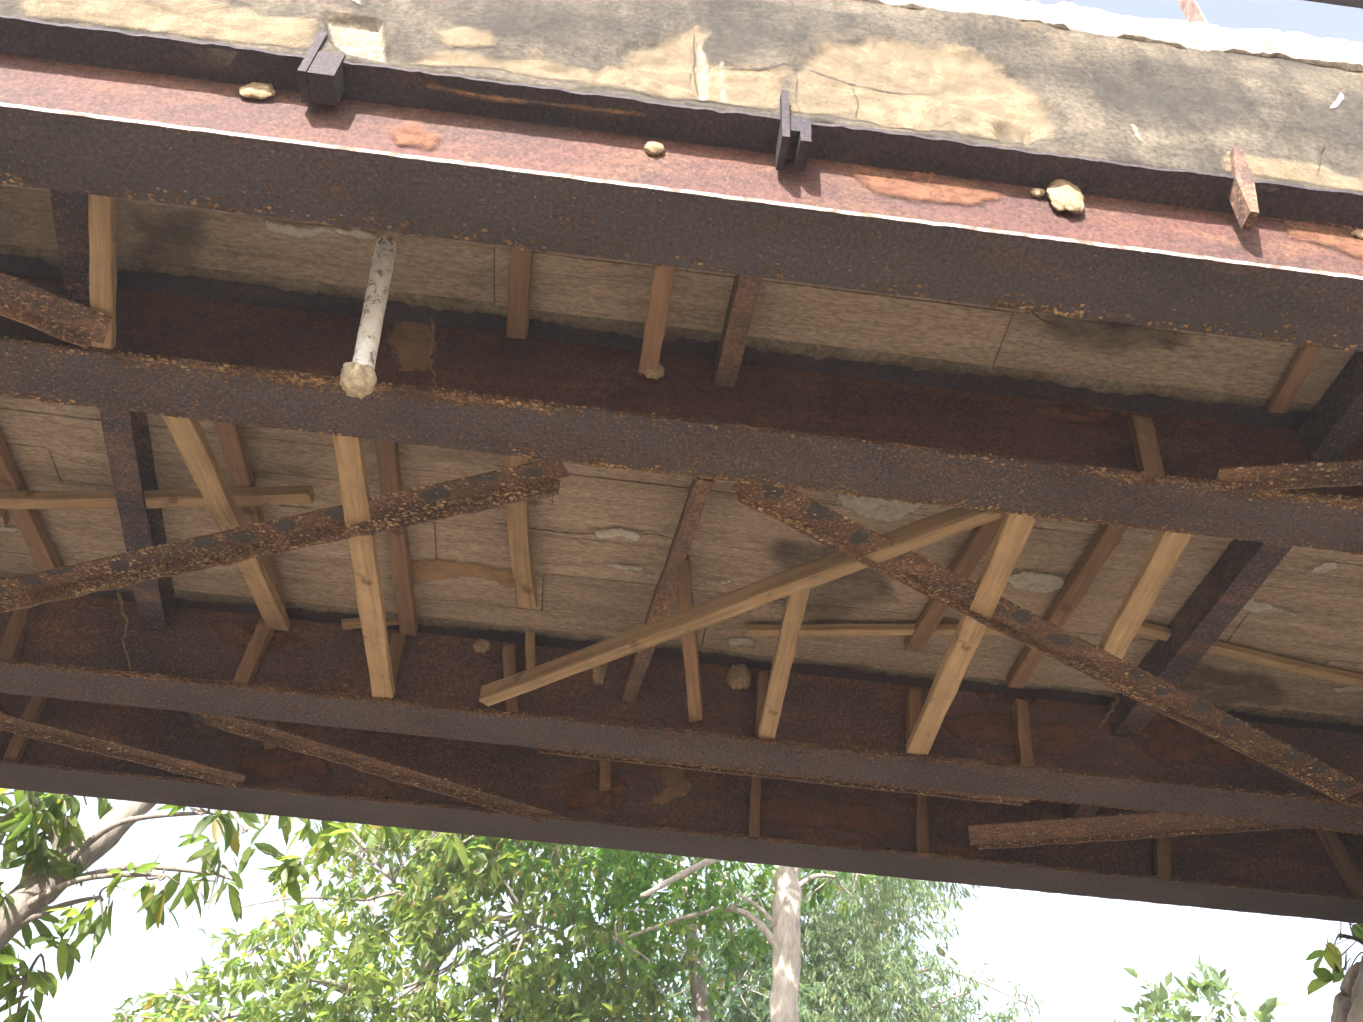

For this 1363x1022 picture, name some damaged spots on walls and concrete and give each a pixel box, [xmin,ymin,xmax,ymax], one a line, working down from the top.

spalling [789,42,1050,144]
corrosion [0,114,1363,352]
corrosion [0,281,344,393]
corrosion [372,321,754,437]
corrosion [0,444,1363,824]
leakage [811,567,888,613]